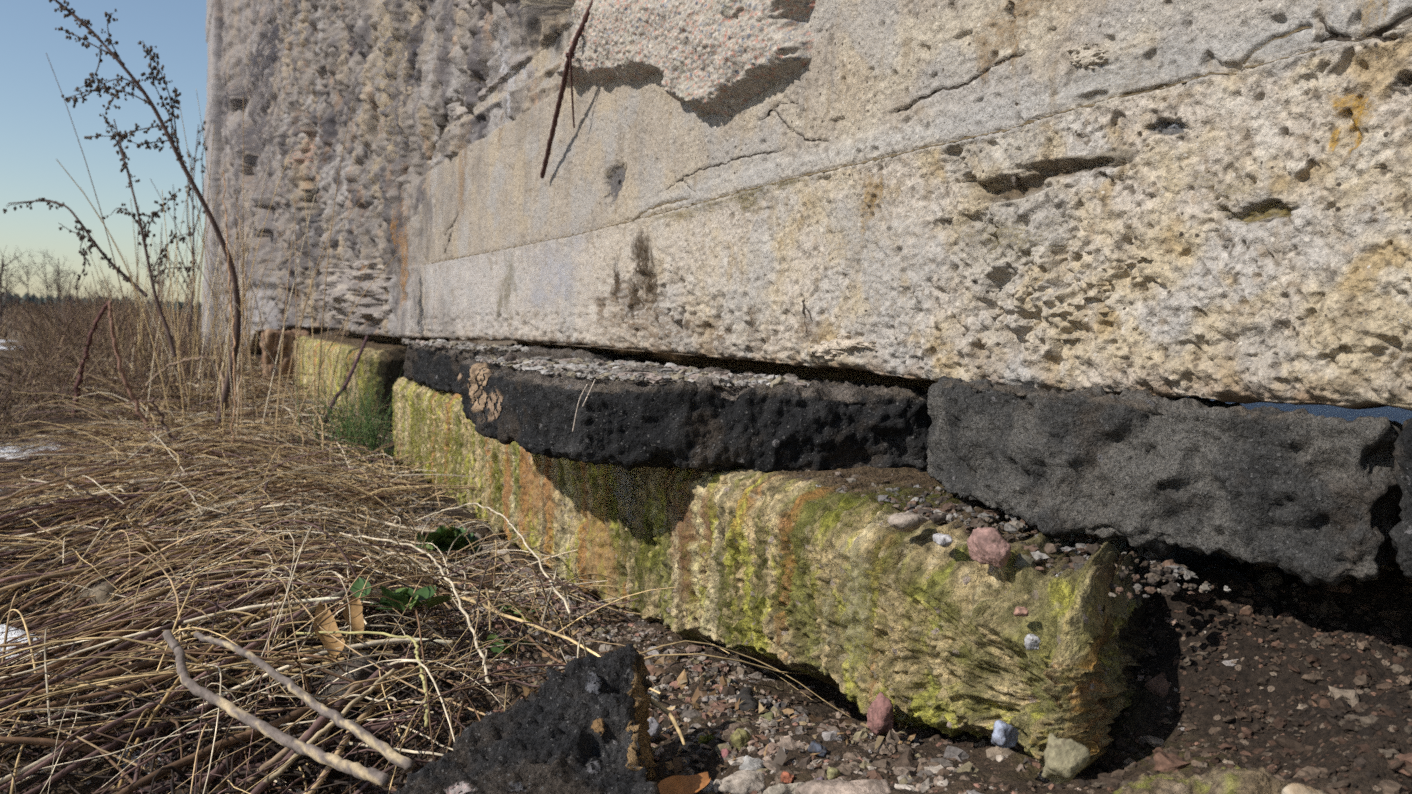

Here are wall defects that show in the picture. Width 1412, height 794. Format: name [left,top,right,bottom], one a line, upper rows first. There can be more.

spalling [449,38,538,126]
spalling [518,0,816,179]
crack [417,13,1412,266]
water stain [598,234,657,321]
water stain [823,559,869,641]